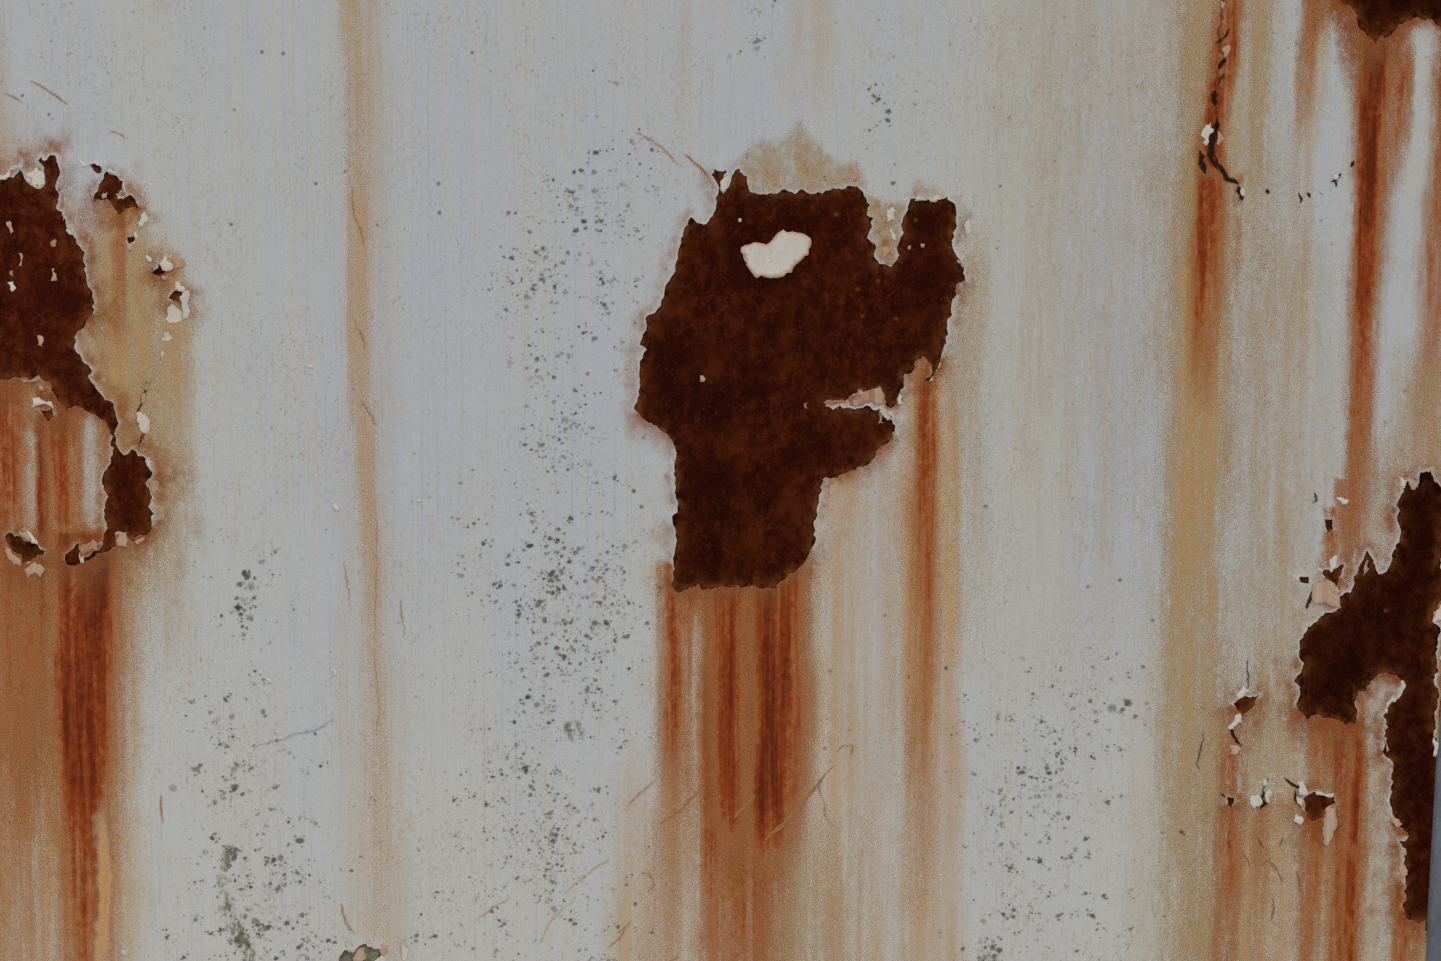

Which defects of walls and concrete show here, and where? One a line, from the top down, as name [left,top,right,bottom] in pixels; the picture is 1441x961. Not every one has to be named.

peeling [0,141,170,583]
rust [0,184,191,961]
peeling [77,157,191,356]
rust [659,564,815,961]
peeling [634,126,972,596]
rust [830,468,859,848]
rust [900,359,959,961]
peeling [1228,661,1261,755]
rust [1164,0,1427,961]
peeling [1284,471,1441,937]
peeling [1325,0,1441,57]
rust [1417,58,1441,416]